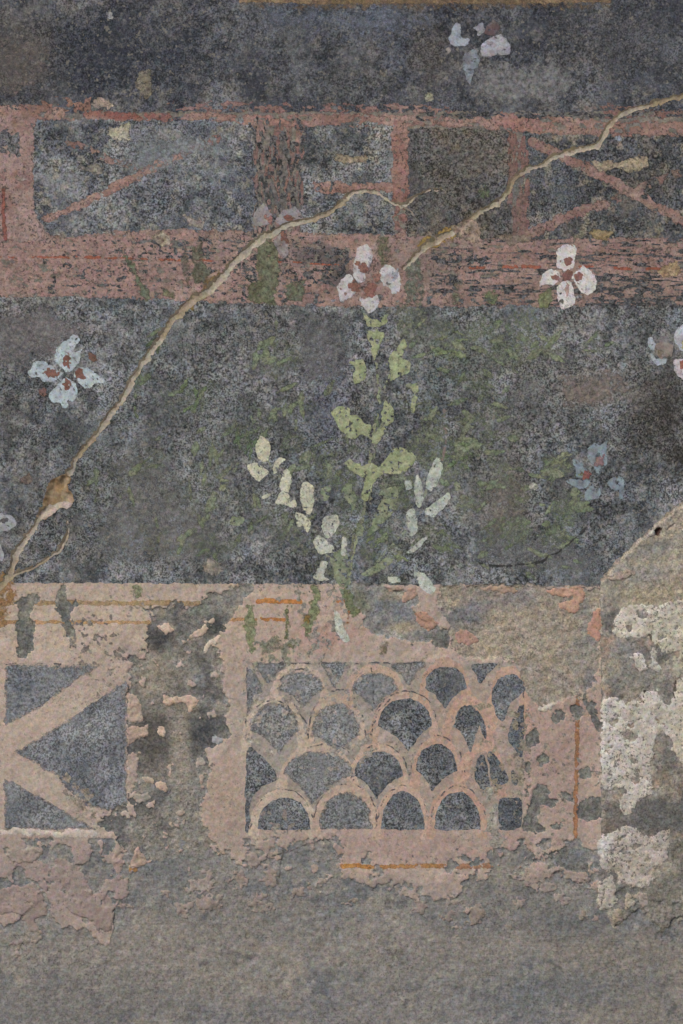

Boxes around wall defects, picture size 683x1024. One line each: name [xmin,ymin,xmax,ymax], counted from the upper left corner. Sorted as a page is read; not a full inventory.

crack [65,93,683,476]
crack [0,507,69,591]
crack [479,514,601,567]
peeling [0,502,683,1024]